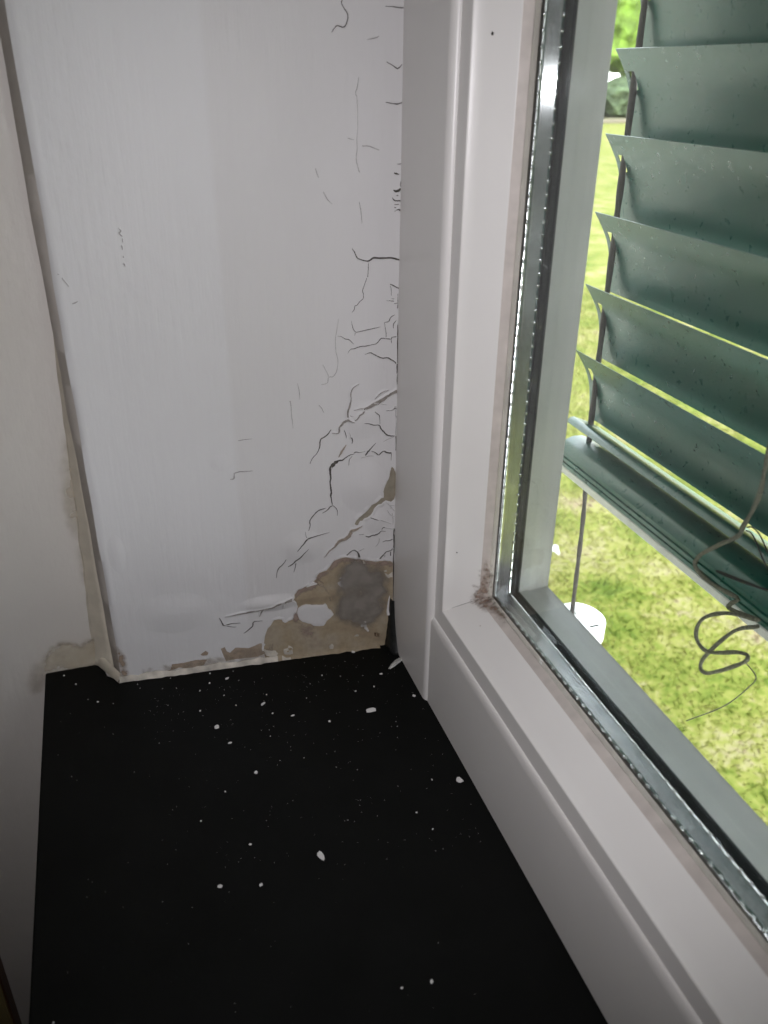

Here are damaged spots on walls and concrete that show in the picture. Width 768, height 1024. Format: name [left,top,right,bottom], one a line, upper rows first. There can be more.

crack [330,0,404,71]
crack [347,77,402,213]
crack [218,248,399,634]
peeling [159,554,393,671]